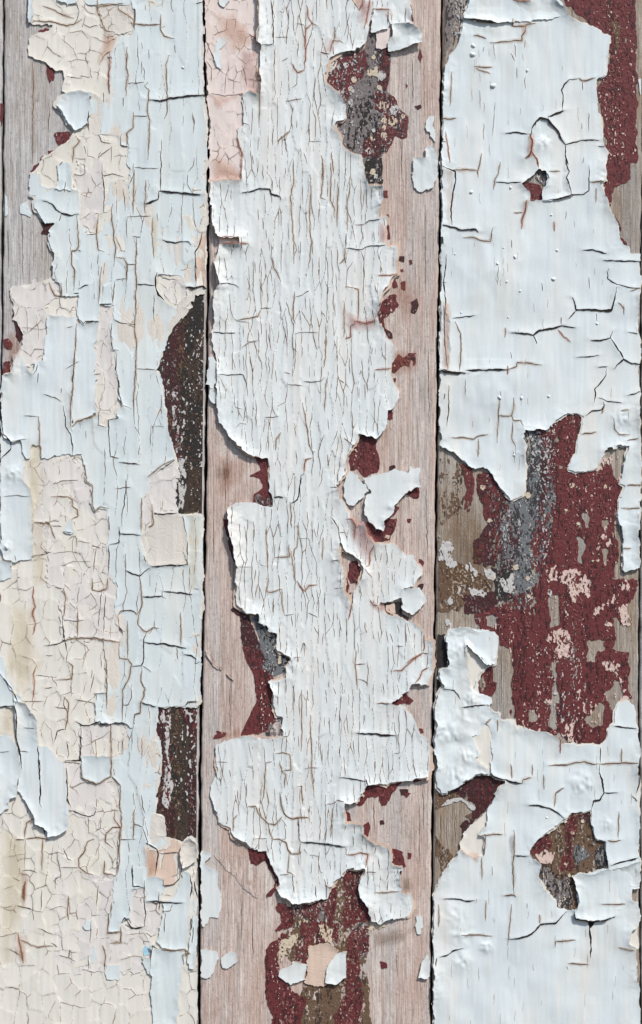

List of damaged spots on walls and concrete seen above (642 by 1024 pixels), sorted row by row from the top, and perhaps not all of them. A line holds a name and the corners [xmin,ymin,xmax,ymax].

crack [400,18,605,464]
crack [505,230,641,343]
peeling [172,330,217,510]
crack [582,329,642,441]
crack [0,0,458,1024]
peeling [344,466,421,531]
peeling [439,535,515,605]
crack [447,664,502,731]
peeling [160,708,197,808]
crack [435,726,640,1024]
peeling [278,961,307,985]
peeling [325,951,347,985]